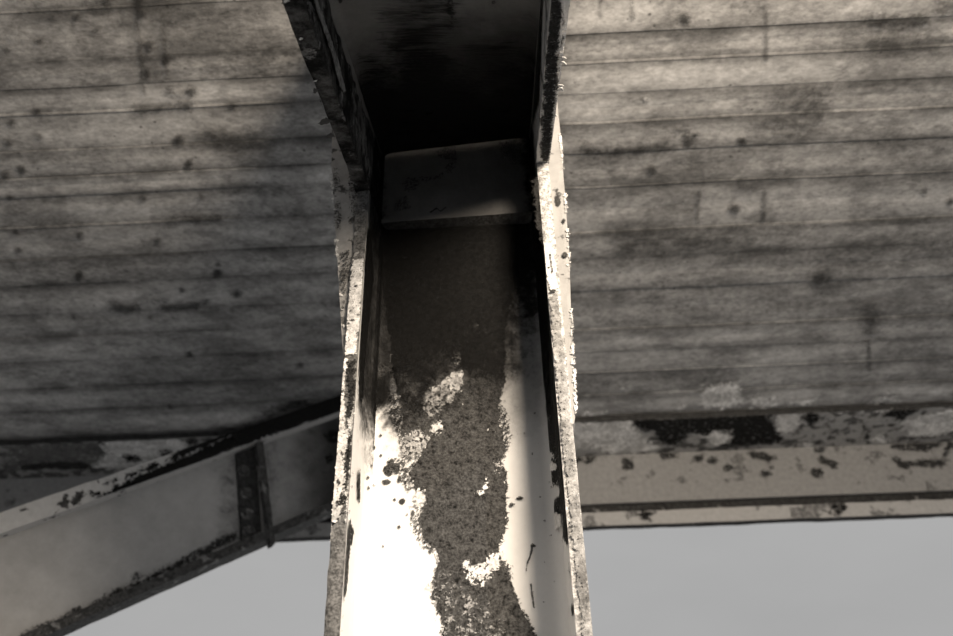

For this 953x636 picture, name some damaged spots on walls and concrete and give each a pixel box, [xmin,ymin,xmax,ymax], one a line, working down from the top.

peeling [898,408,953,437]
peeling [91,426,260,498]